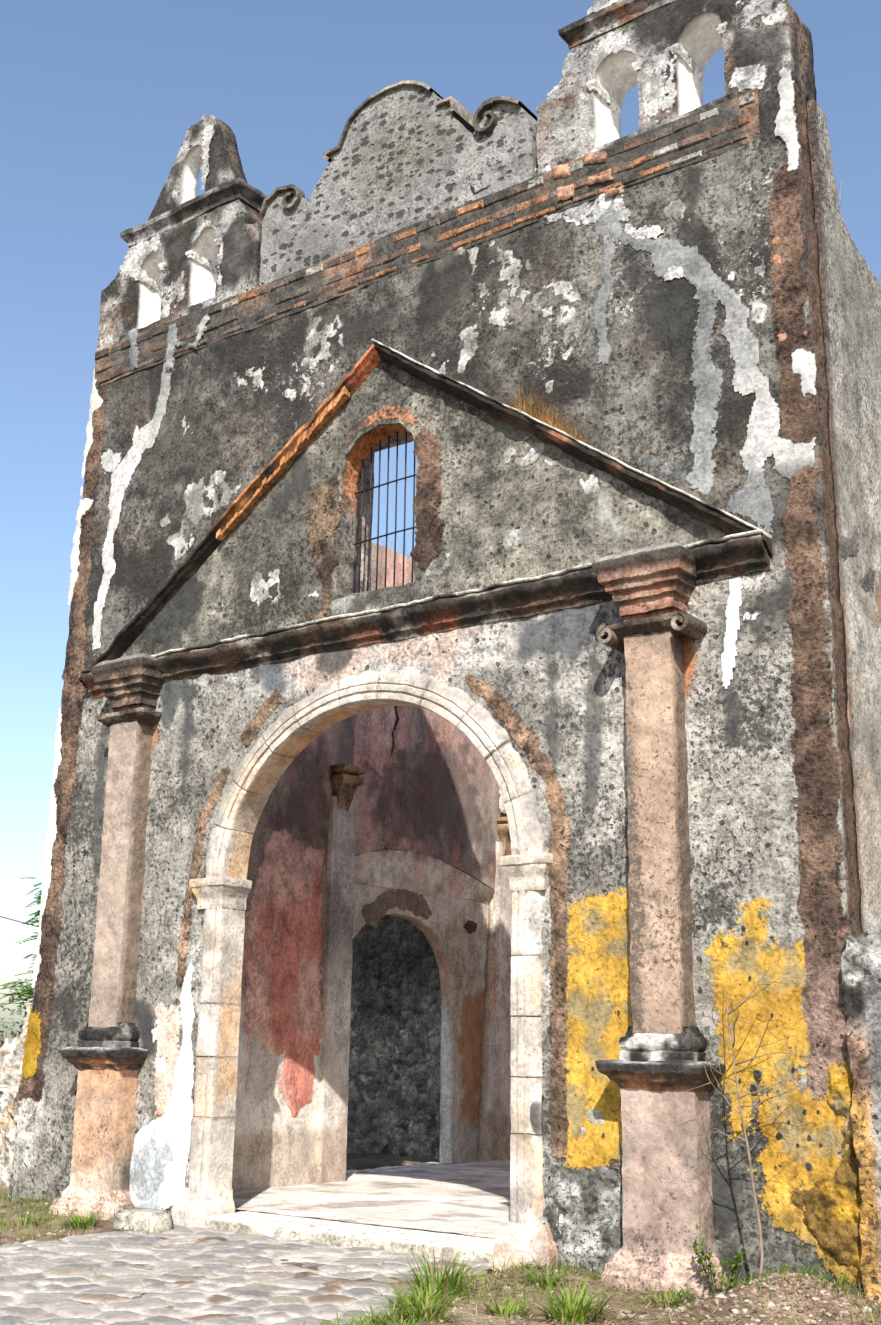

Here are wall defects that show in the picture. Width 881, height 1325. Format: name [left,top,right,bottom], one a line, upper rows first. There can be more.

water stain [721,149,738,206]
water stain [591,166,816,538]
water stain [92,358,175,651]
water stain [135,575,205,651]
flaking render [342,403,450,576]
flaking render [859,567,876,594]
peeling [14,378,107,1102]
peeling [728,130,862,1280]
water stain [711,1166,742,1235]